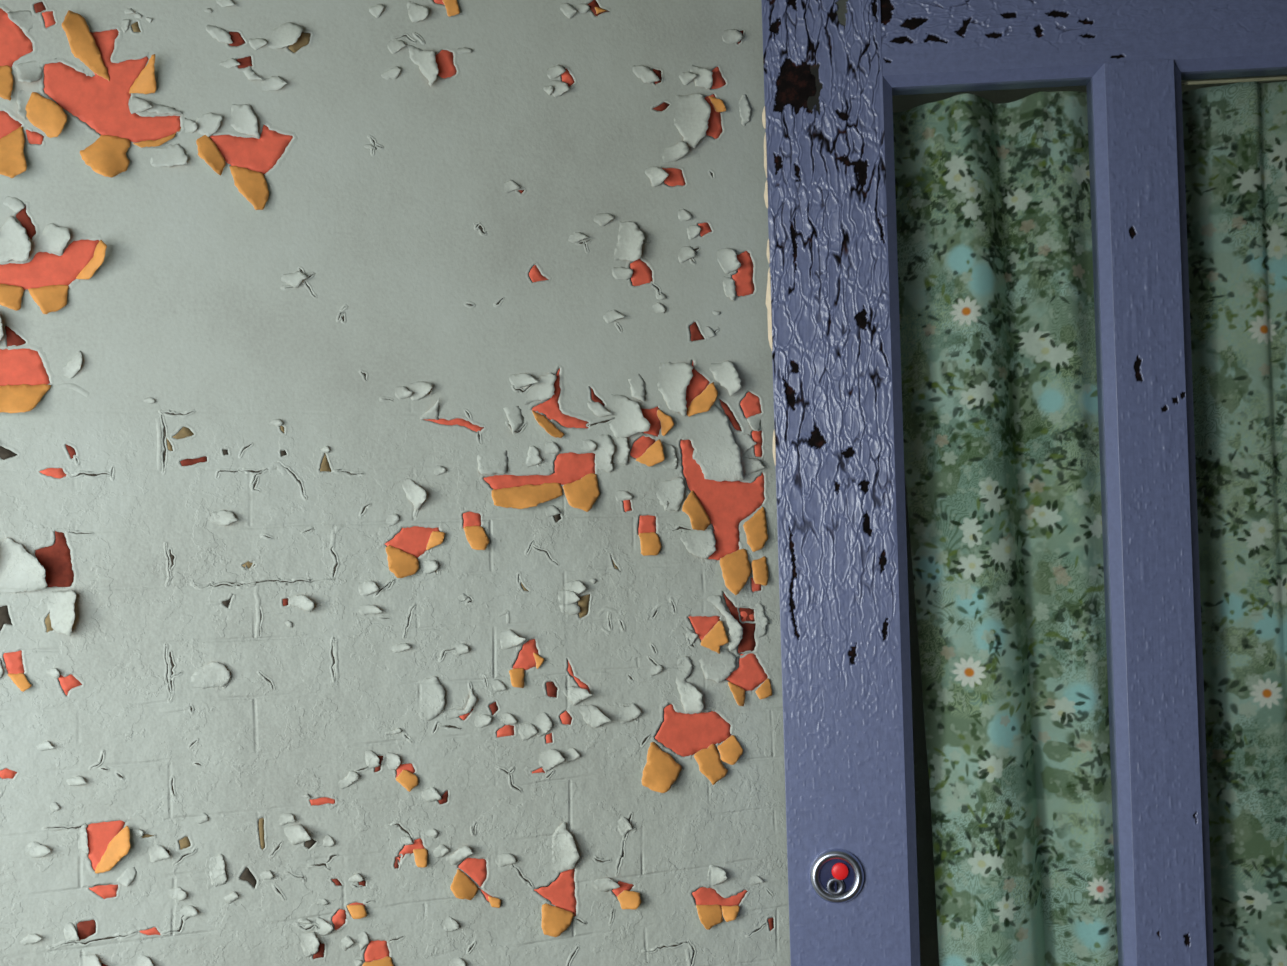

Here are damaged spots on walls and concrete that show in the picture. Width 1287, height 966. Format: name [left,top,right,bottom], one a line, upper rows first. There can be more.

peeling [0,0,314,210]
peeling [381,0,472,87]
peeling [0,196,107,413]
peeling [525,261,552,286]
peeling [594,213,666,313]
peeling [678,209,773,351]
peeling [0,526,95,692]
peeling [358,309,776,794]
crack [761,0,1287,966]
peeling [20,802,406,966]
peeling [384,821,641,937]
peeling [687,865,774,930]